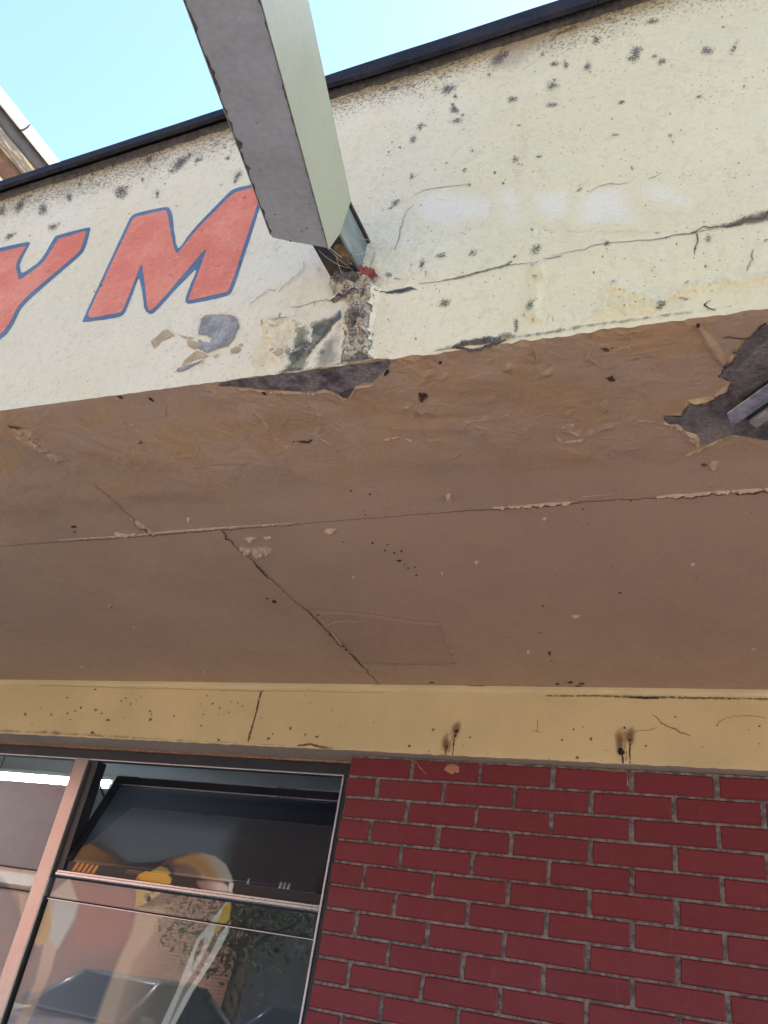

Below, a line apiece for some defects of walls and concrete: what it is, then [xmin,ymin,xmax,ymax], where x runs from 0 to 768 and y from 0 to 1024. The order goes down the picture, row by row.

leakage [460,10,636,80]
crack [395,184,465,249]
crack [248,209,768,326]
peeling [150,312,244,373]
spalling [219,360,390,402]
peeling [663,323,768,472]
crack [8,426,64,464]
crack [9,486,768,742]
rust [443,725,459,755]
rust [617,727,633,764]